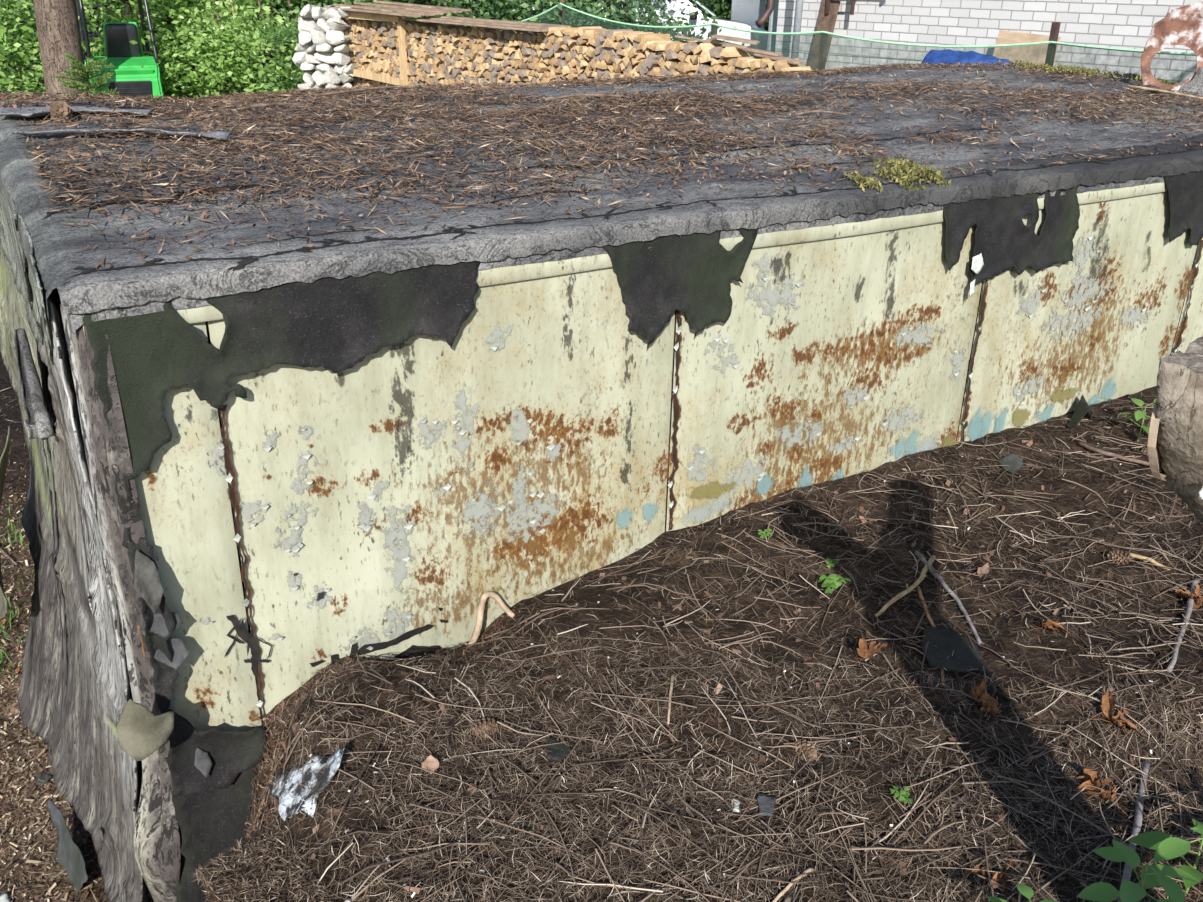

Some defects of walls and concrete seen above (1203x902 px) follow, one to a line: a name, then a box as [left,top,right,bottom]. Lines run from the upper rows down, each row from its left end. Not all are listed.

corrosion [308,476,338,498]
corrosion [354,400,643,637]
corrosion [701,300,948,521]
corrosion [936,420,961,448]
corrosion [992,248,1200,426]